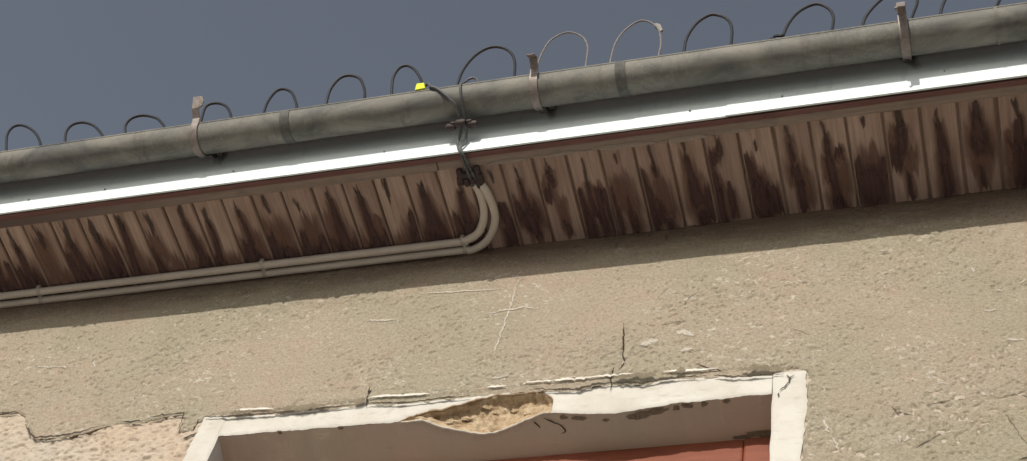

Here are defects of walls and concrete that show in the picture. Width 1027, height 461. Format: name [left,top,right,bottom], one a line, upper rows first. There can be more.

damp [0,108,1027,314]
crack [533,323,794,396]
spalling [399,372,656,435]
peeling [626,401,708,420]